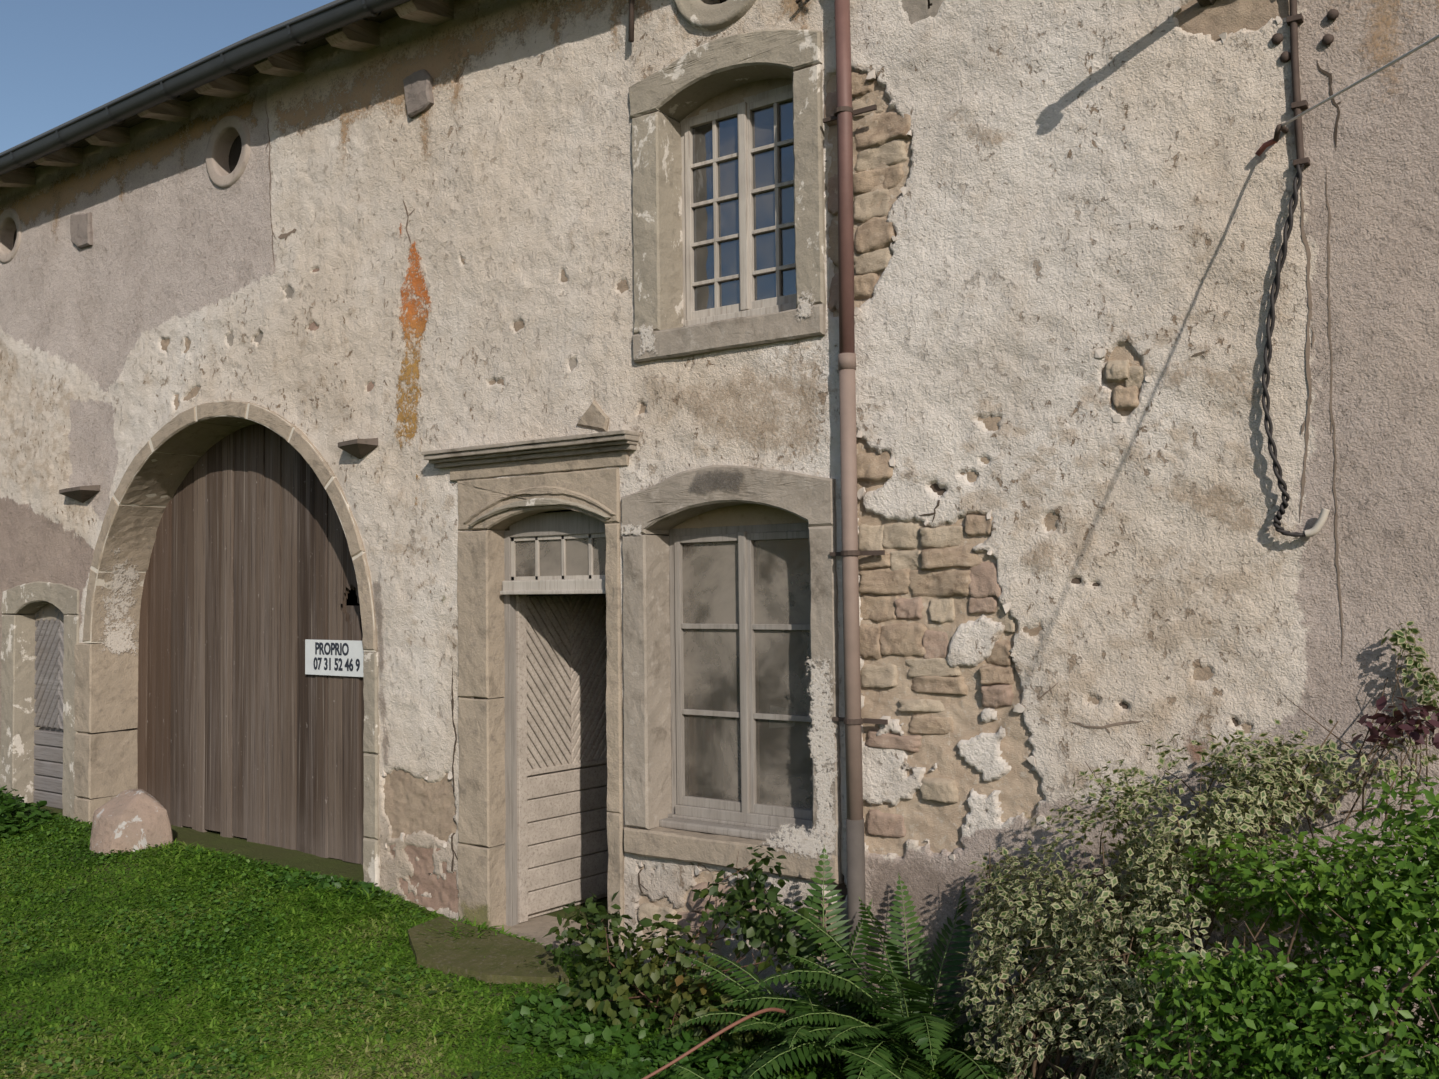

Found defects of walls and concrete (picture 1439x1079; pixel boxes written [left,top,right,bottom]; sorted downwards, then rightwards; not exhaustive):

flaking render [901,0,944,25]
flaking render [1174,0,1290,44]
corrosion [395,224,431,448]
flaking render [1095,345,1151,423]
flaking render [978,415,1002,431]
flaking render [960,457,990,482]
flaking render [1023,623,1043,636]
flaking render [382,769,459,913]